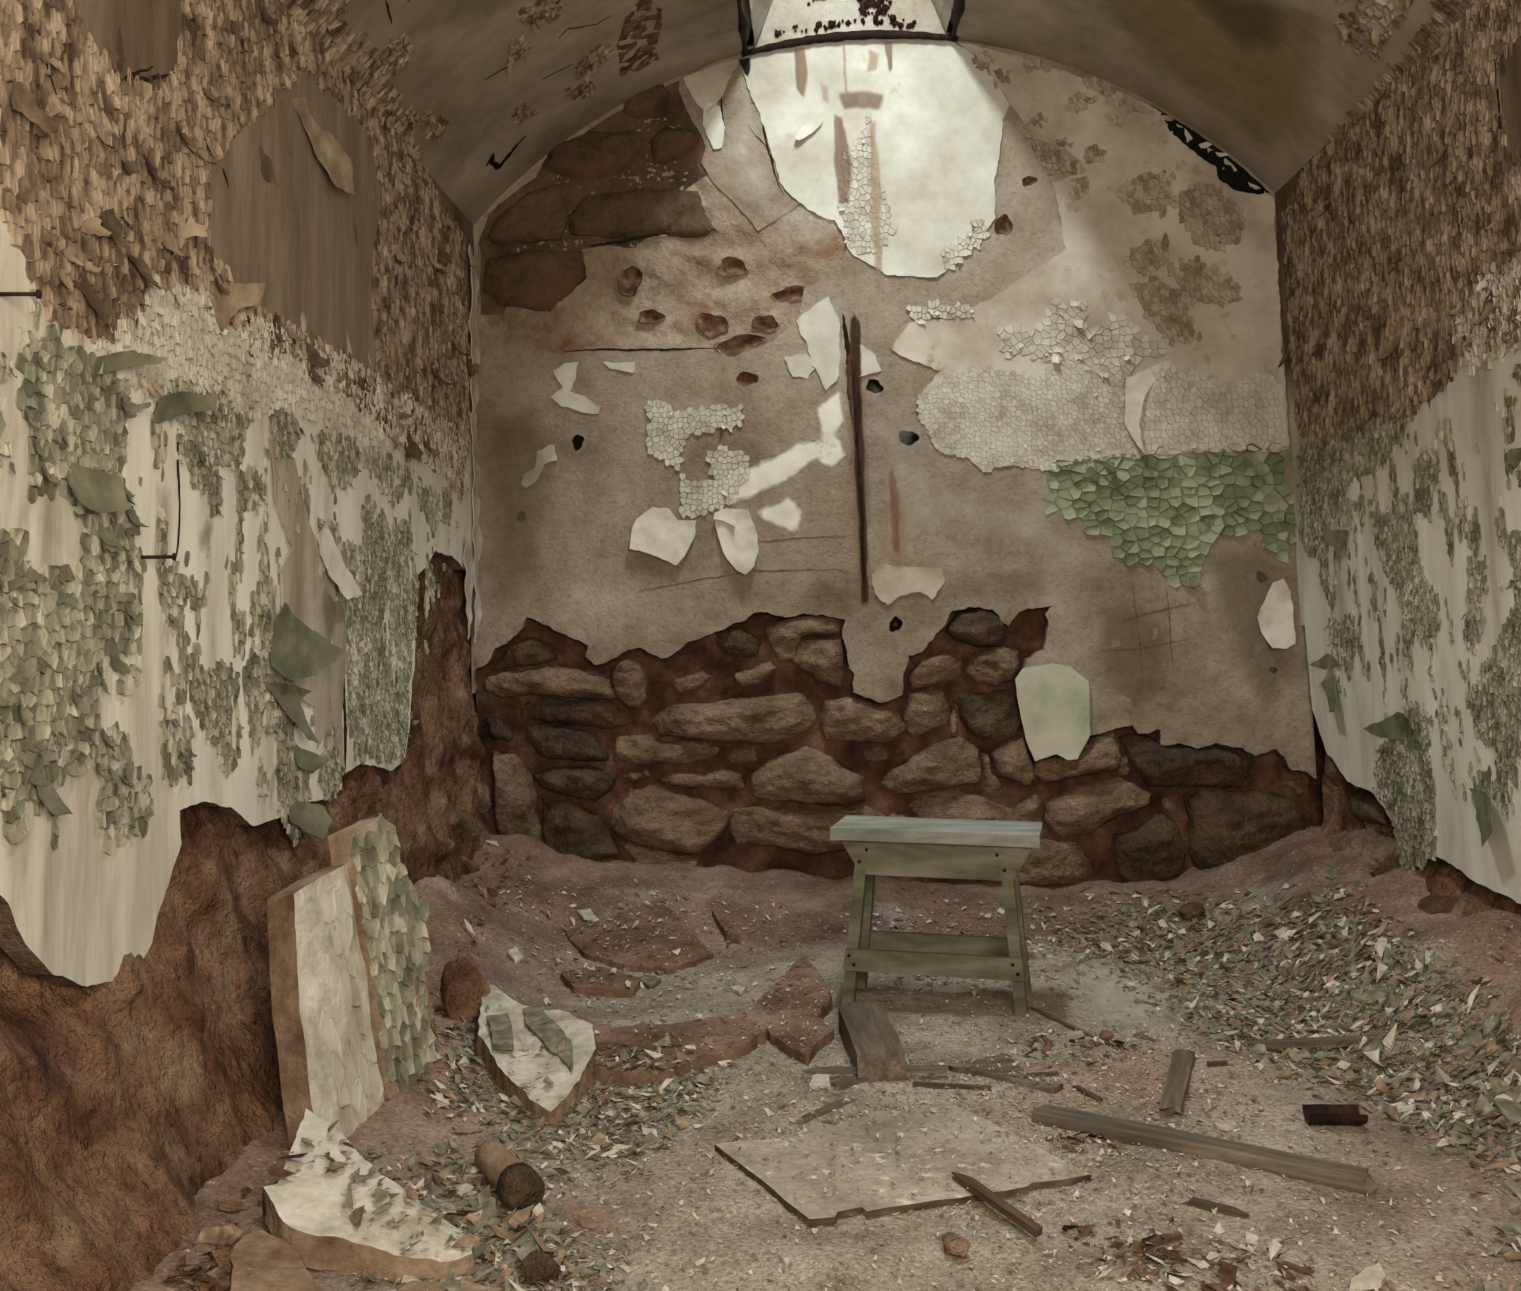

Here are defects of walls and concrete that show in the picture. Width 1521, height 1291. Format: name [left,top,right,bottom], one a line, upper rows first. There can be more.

flaking render [968,214,1013,236]
peeling [972,50,1051,89]
peeling [1022,110,1107,200]
peeling [0,0,849,856]
corrosion [850,315,868,602]
spalling [866,380,884,393]
spalling [899,431,919,446]
peeling [1042,0,1521,872]
flaking render [476,606,1313,887]
peeling [317,813,437,1138]